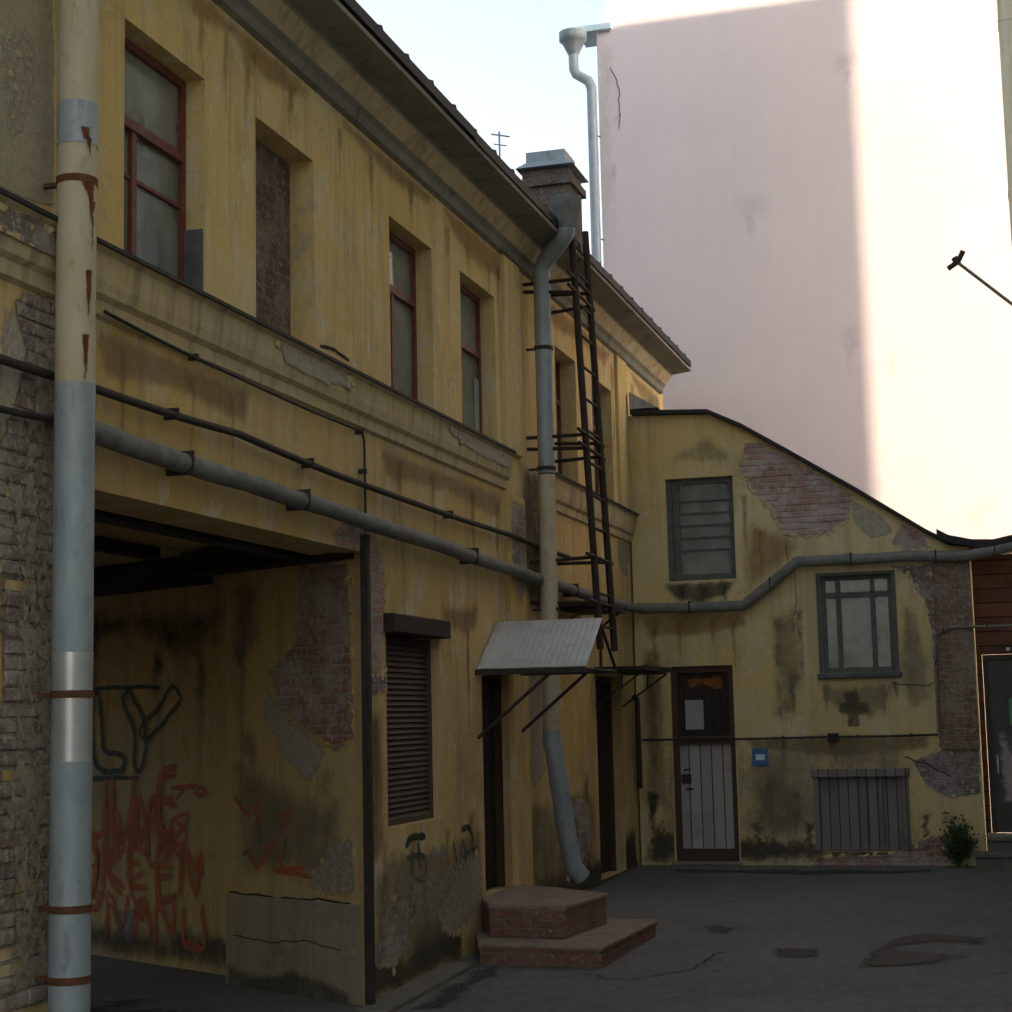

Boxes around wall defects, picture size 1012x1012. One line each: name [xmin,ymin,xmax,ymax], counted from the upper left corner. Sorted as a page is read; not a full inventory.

corrosion [82,126,91,152]
corrosion [82,181,95,246]
damp [668,582,731,602]
flaking render [0,291,55,1012]
flaking render [267,521,388,752]
flaking render [888,562,982,799]
damp [532,811,637,891]
damp [648,779,974,874]
crack [233,926,341,956]
flaking render [375,892,410,977]